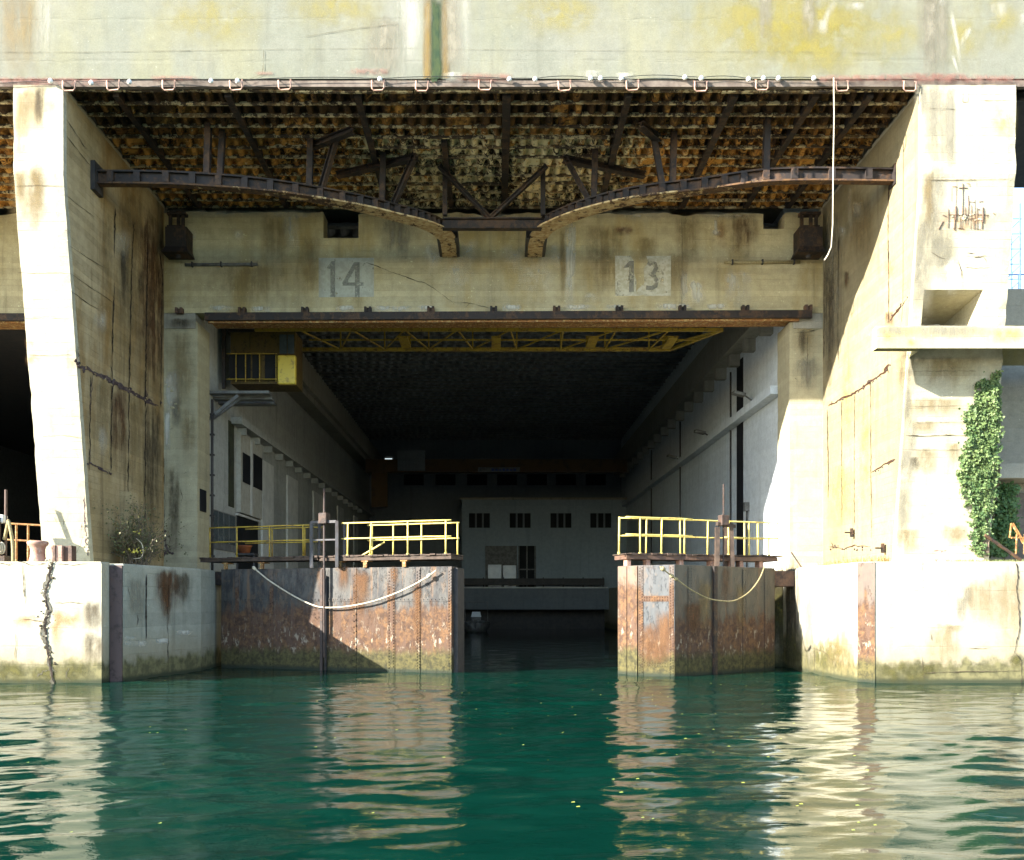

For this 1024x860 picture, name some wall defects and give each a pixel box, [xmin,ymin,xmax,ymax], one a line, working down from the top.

crack [366,262,488,308]
damp [100,386,159,496]
crack [1,520,85,683]
rust [160,572,179,614]
rust [340,567,367,603]